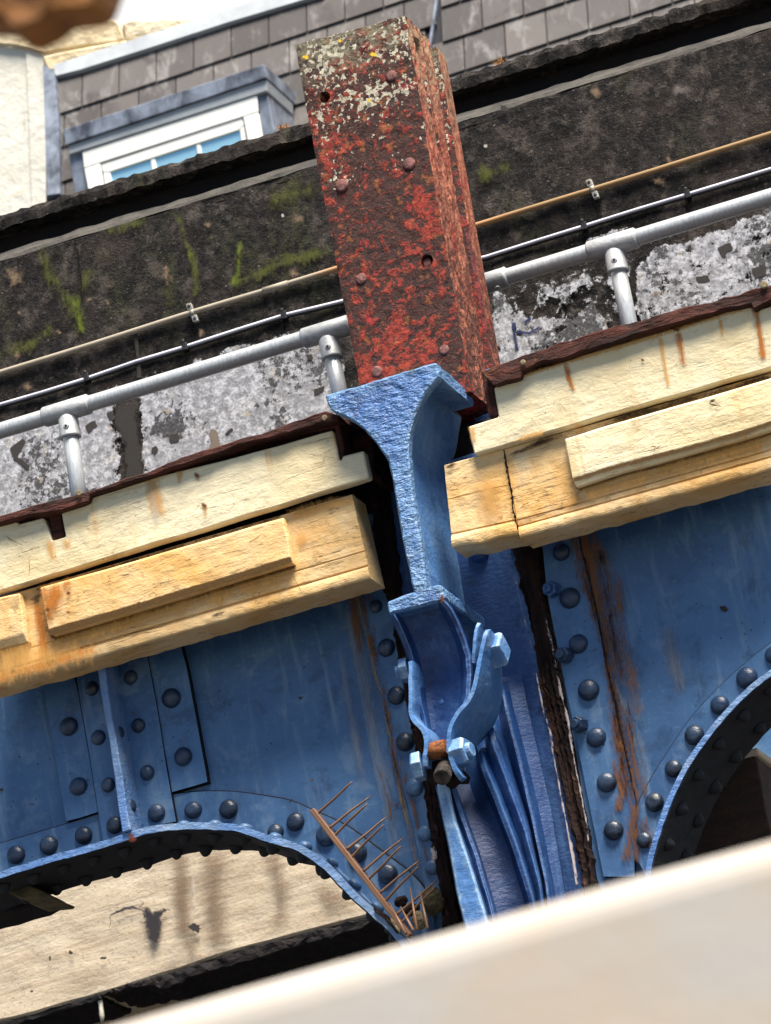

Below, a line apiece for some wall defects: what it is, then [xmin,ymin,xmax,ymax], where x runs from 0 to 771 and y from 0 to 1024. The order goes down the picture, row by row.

peeling [627,206,771,321]
peeling [220,342,255,355]
peeling [492,268,618,364]
corrosion [482,281,771,420]
peeling [0,424,71,516]
peeling [78,404,123,492]
peeling [139,345,336,474]
crack [448,449,557,539]
corrosion [572,532,654,862]
corrosion [349,594,464,934]
leakage [174,854,229,954]